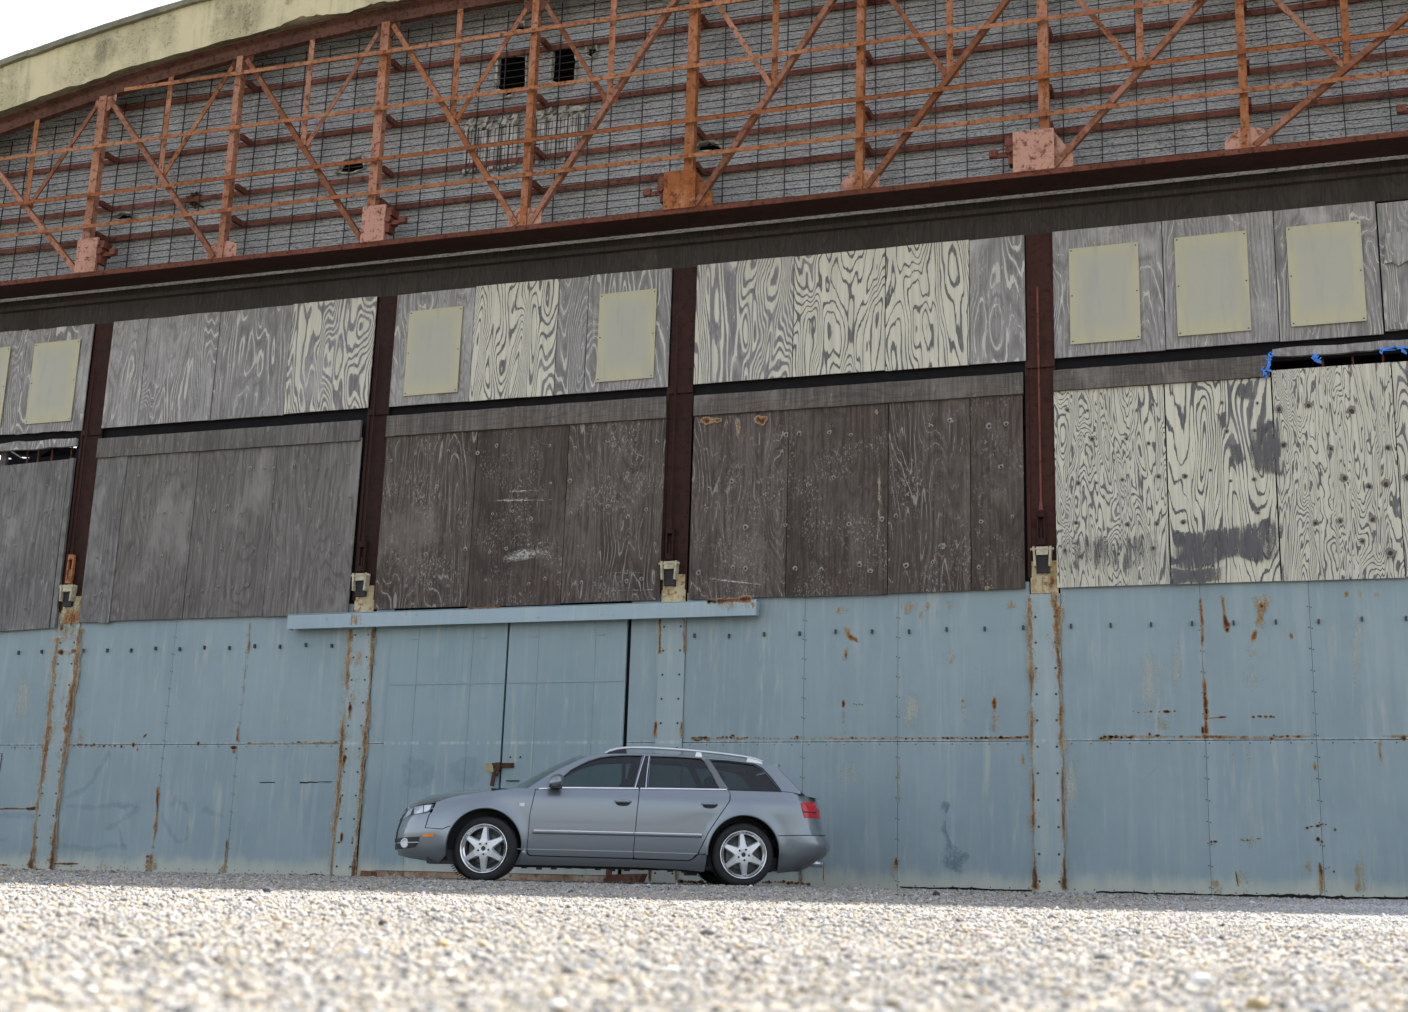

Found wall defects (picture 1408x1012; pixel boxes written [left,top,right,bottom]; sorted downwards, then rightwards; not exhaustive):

corrosion [701,415,768,433]
corrosion [0,605,147,871]
corrosion [230,615,376,876]
corrosion [680,571,1068,891]
corrosion [1099,596,1316,761]